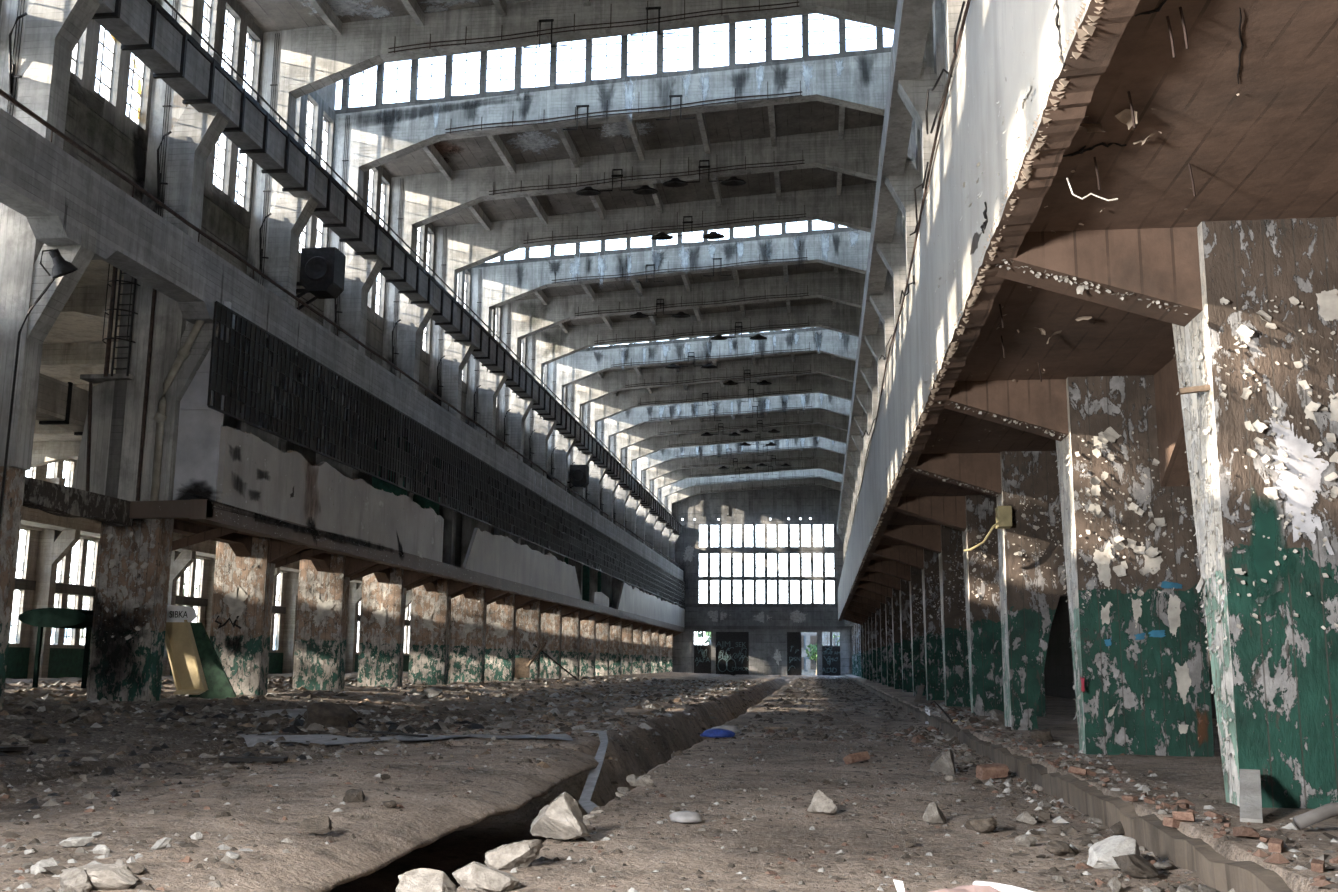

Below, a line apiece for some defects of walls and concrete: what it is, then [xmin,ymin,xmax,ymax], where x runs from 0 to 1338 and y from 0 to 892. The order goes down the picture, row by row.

damp [384,112,394,144]
damp [522,95,530,116]
damp [599,85,650,137]
damp [734,66,787,96]
damp [859,59,872,82]
peeling [850,0,1338,727]
peeling [295,574,344,687]
peeling [365,590,397,682]
peeling [412,601,538,680]
peeling [1210,674,1232,767]